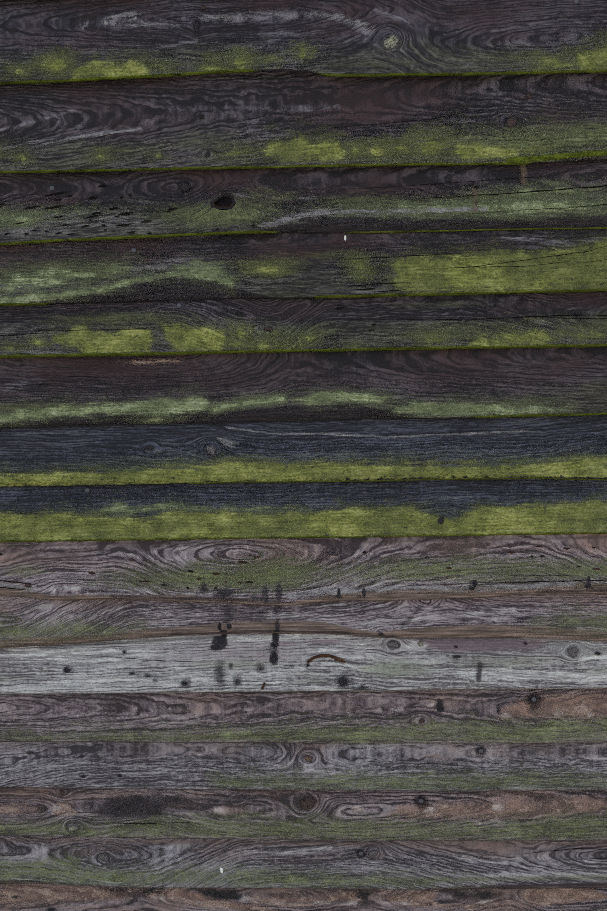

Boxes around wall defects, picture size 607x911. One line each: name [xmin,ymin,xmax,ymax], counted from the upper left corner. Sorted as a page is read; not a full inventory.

leakage [269,633,279,665]